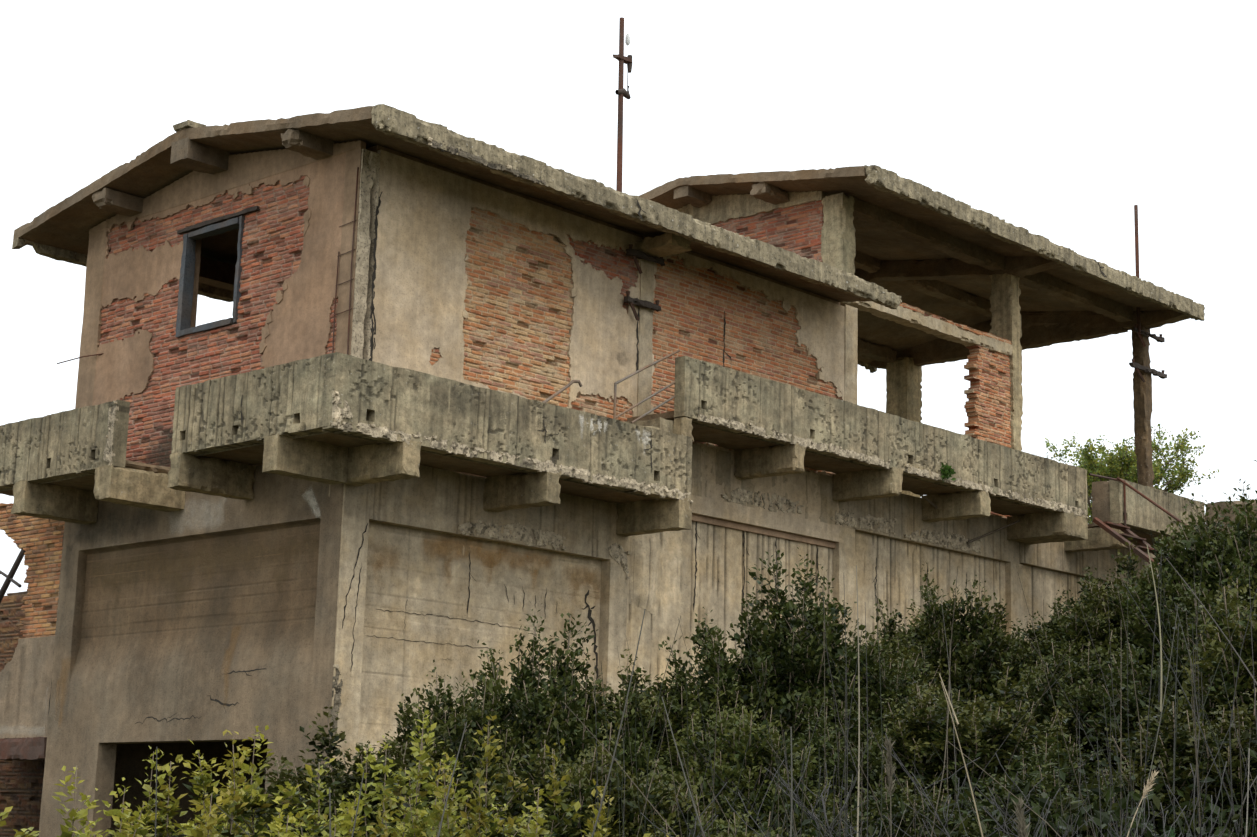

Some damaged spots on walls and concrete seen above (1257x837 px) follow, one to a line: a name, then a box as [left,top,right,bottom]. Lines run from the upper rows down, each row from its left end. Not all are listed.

peeling [57,175,311,467]
peeling [462,207,638,422]
peeling [651,256,842,414]
crack [342,523,598,680]
spalling [458,519,566,550]
spalling [721,487,804,514]
spalling [697,414,891,469]
spalling [905,464,1088,518]